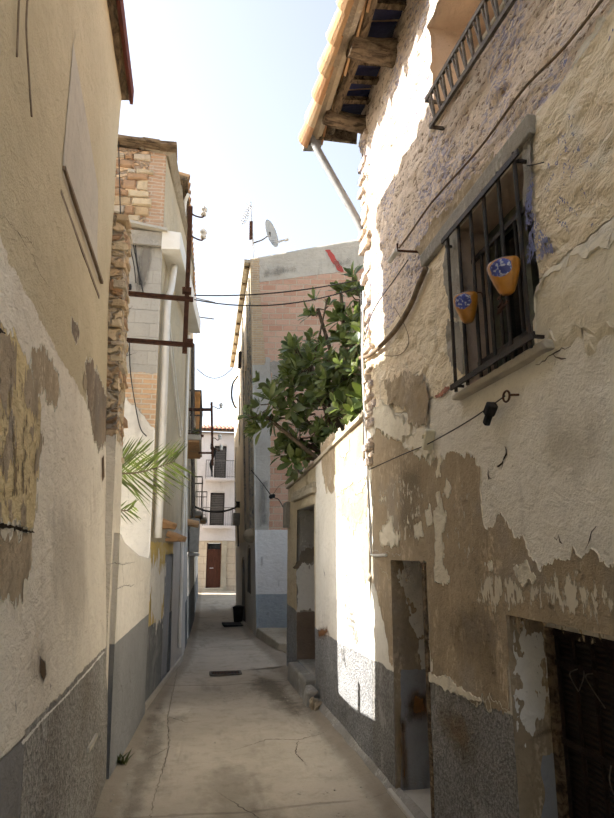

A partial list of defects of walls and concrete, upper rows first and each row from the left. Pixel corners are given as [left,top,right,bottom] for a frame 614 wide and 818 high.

flaking render [0,321,61,609]
flaking render [83,356,107,454]
peeling [293,544,314,569]
flaking render [320,371,614,748]